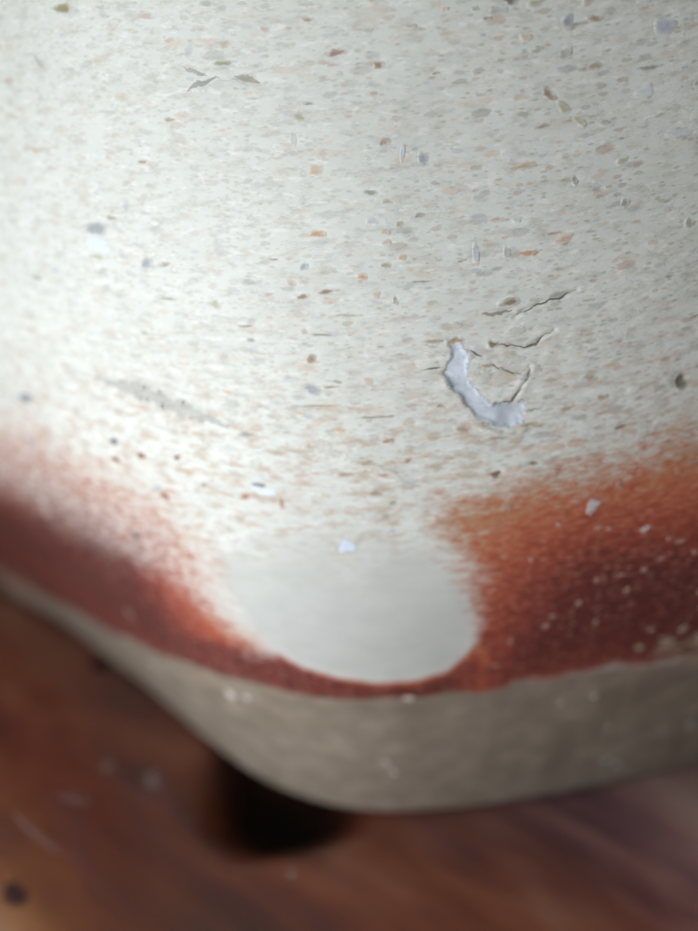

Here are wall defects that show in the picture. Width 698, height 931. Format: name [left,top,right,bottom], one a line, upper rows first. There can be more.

crack [419,291,572,443]
rust [0,372,698,709]